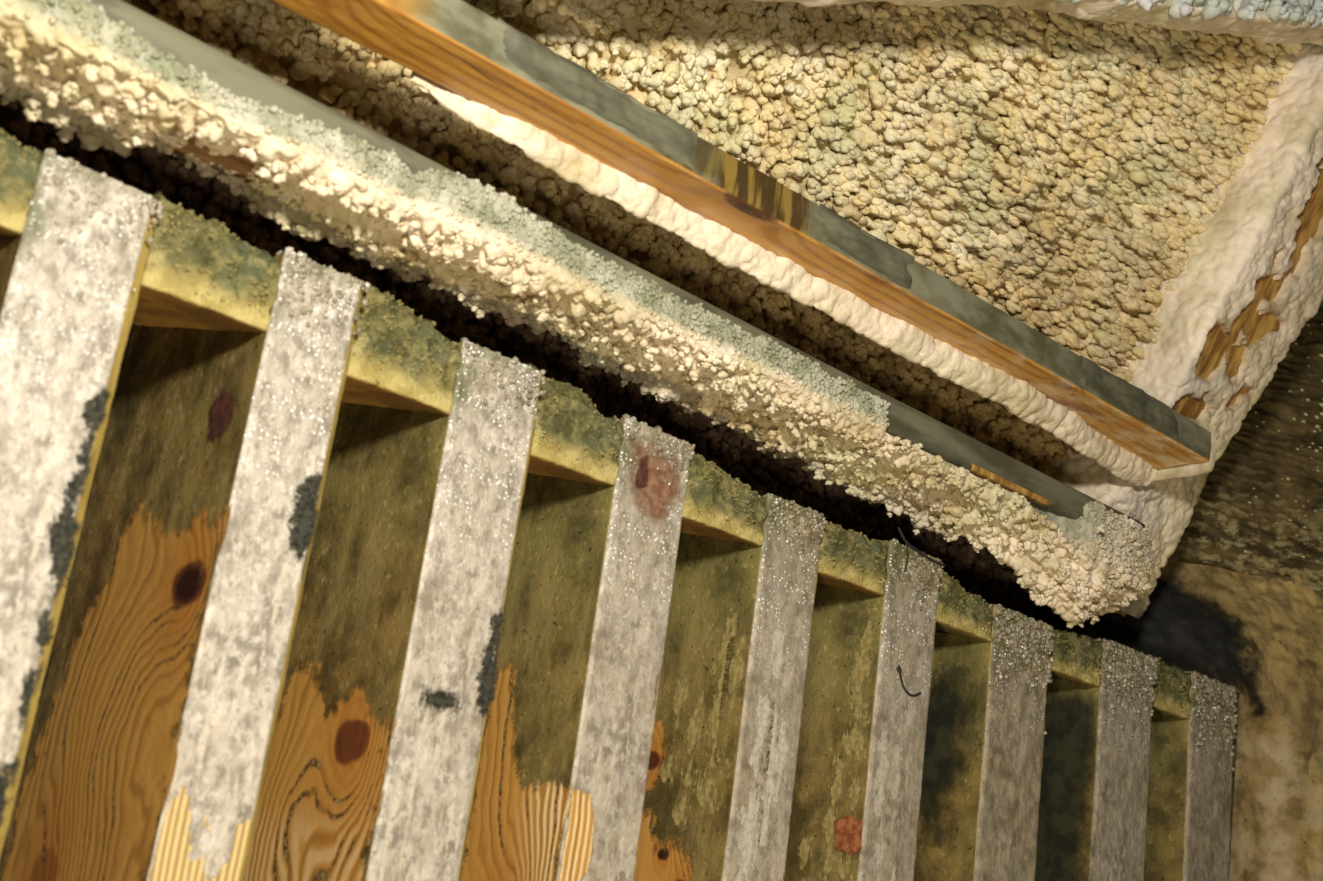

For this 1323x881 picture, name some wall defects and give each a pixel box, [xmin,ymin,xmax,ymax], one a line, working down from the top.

damp [0,0,1265,730]
damp [1289,389,1323,472]
corrosion [633,444,678,518]
peeling [1,503,232,881]
damp [0,757,21,825]
corrosion [834,815,862,855]